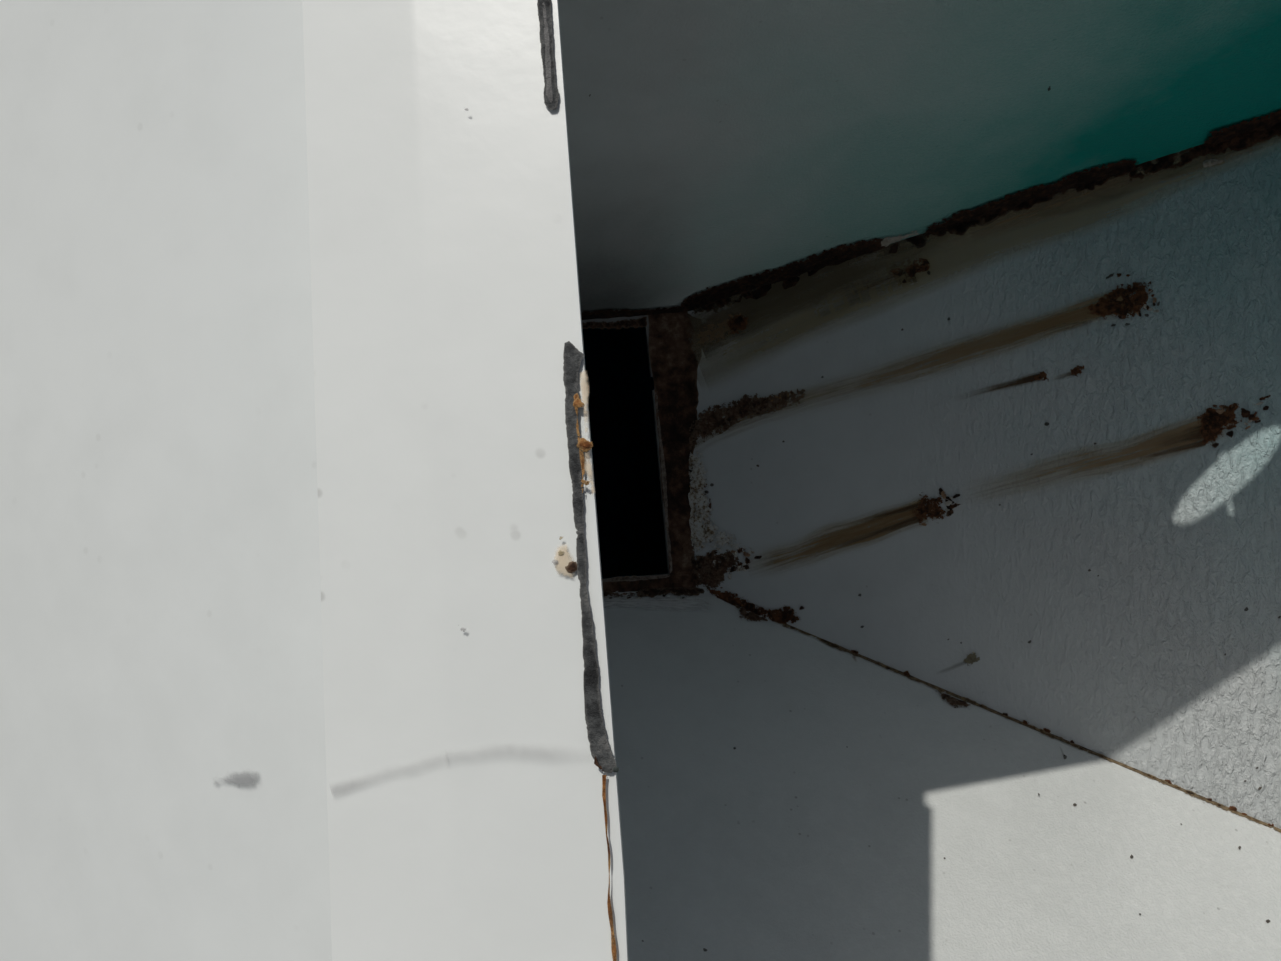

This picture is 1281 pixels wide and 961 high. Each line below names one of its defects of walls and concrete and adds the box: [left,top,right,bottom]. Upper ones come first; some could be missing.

rust [581,273,1160,600]
rust [1031,395,1271,479]
crack [775,619,1281,833]